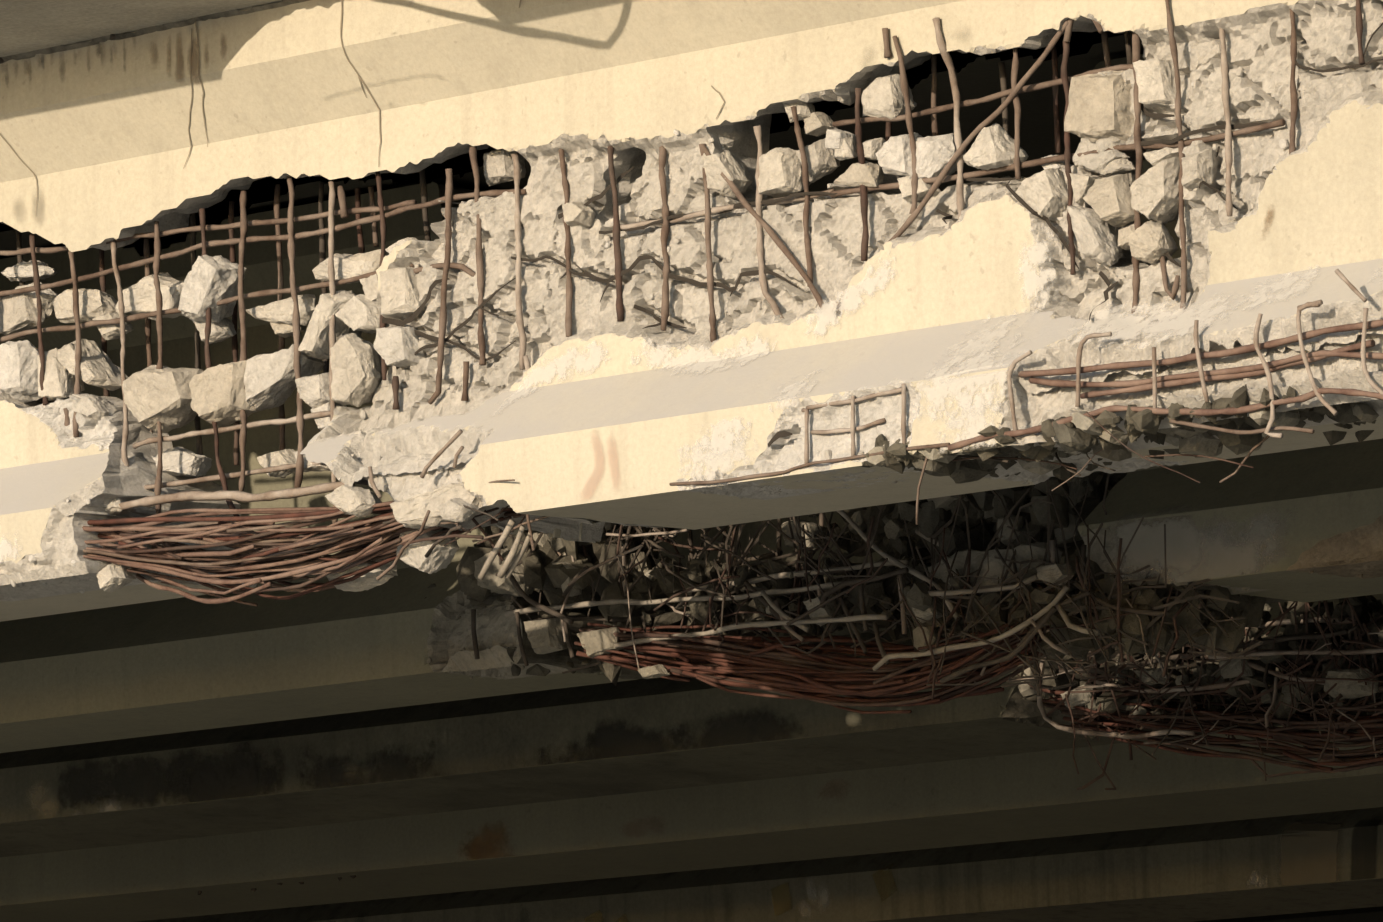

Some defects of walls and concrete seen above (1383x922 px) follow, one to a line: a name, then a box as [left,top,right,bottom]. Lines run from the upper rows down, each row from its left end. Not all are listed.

crack [183,21,208,169]
crack [340,0,381,167]
crack [0,134,38,210]
spalling [309,0,1383,507]
spalling [0,391,117,451]
spalling [0,476,105,601]
spalling [1081,528,1268,595]
spalling [427,590,568,680]
spalling [1000,660,1062,729]
leakage [30,738,281,815]